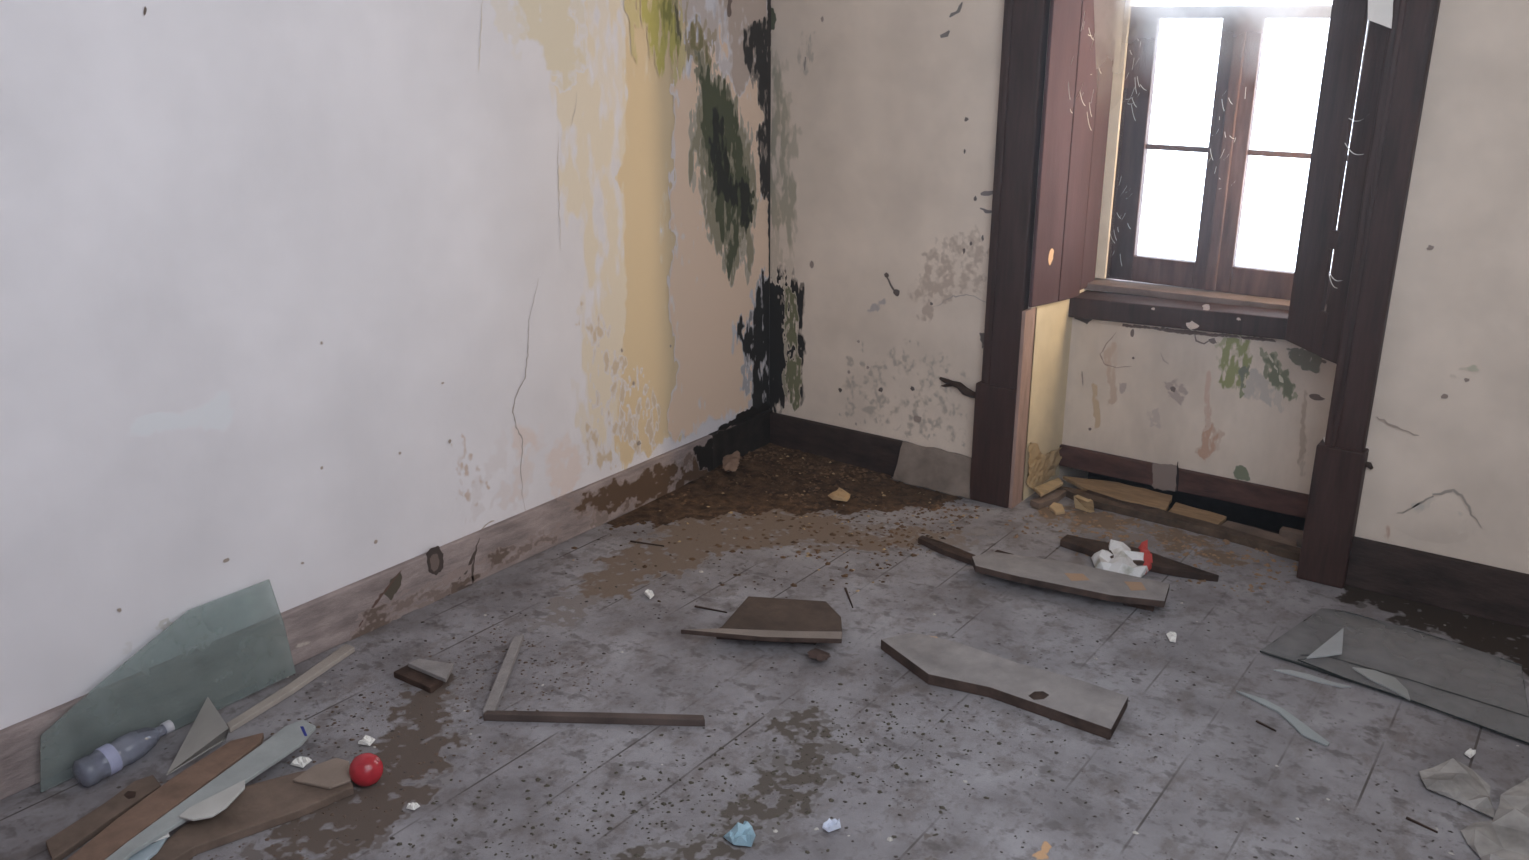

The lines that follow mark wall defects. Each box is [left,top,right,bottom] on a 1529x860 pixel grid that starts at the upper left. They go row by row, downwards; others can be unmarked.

crack [448,283,538,596]
leakage [449,0,815,524]
peeling [1186,304,1210,330]
crack [1397,489,1482,528]